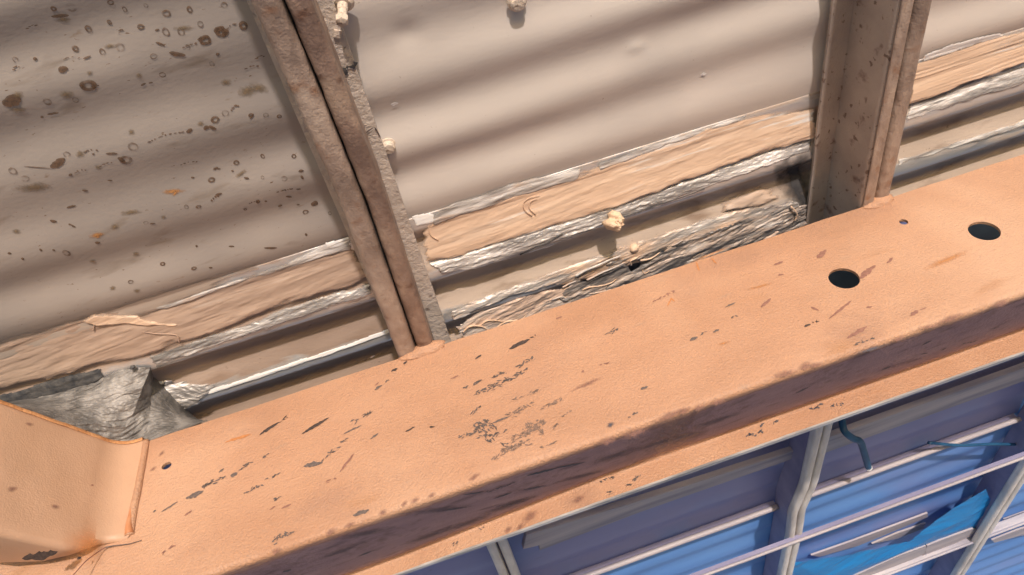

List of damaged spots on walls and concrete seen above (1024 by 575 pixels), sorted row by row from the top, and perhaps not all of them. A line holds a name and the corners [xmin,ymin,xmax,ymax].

corrosion [58,45,113,73]
corrosion [137,6,248,66]
corrosion [2,93,24,112]
corrosion [63,72,99,103]
corrosion [231,85,282,119]
corrosion [9,116,219,176]
corrosion [185,160,249,208]
corrosion [243,154,318,214]
peeling [451,356,572,460]
peeling [304,411,371,467]
peeling [153,453,269,516]